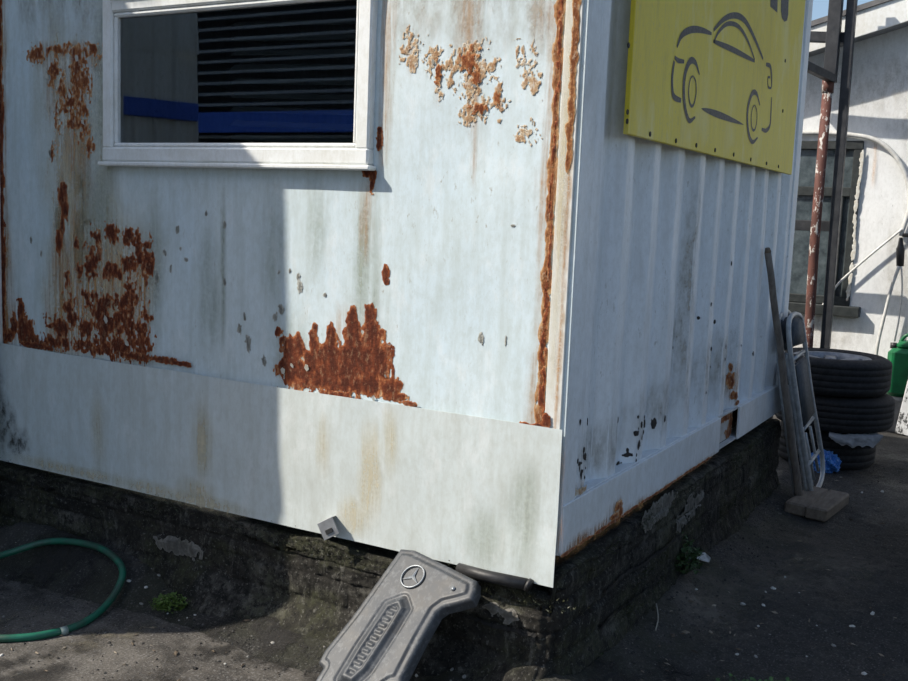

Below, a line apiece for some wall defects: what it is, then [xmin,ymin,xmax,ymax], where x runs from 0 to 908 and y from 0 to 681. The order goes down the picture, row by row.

corrosion [0,0,192,368]
corrosion [519,0,582,428]
corrosion [273,303,417,407]
peeling [616,415,666,465]
corrosion [721,363,739,439]
corrosion [560,457,711,558]
spalling [641,490,704,534]